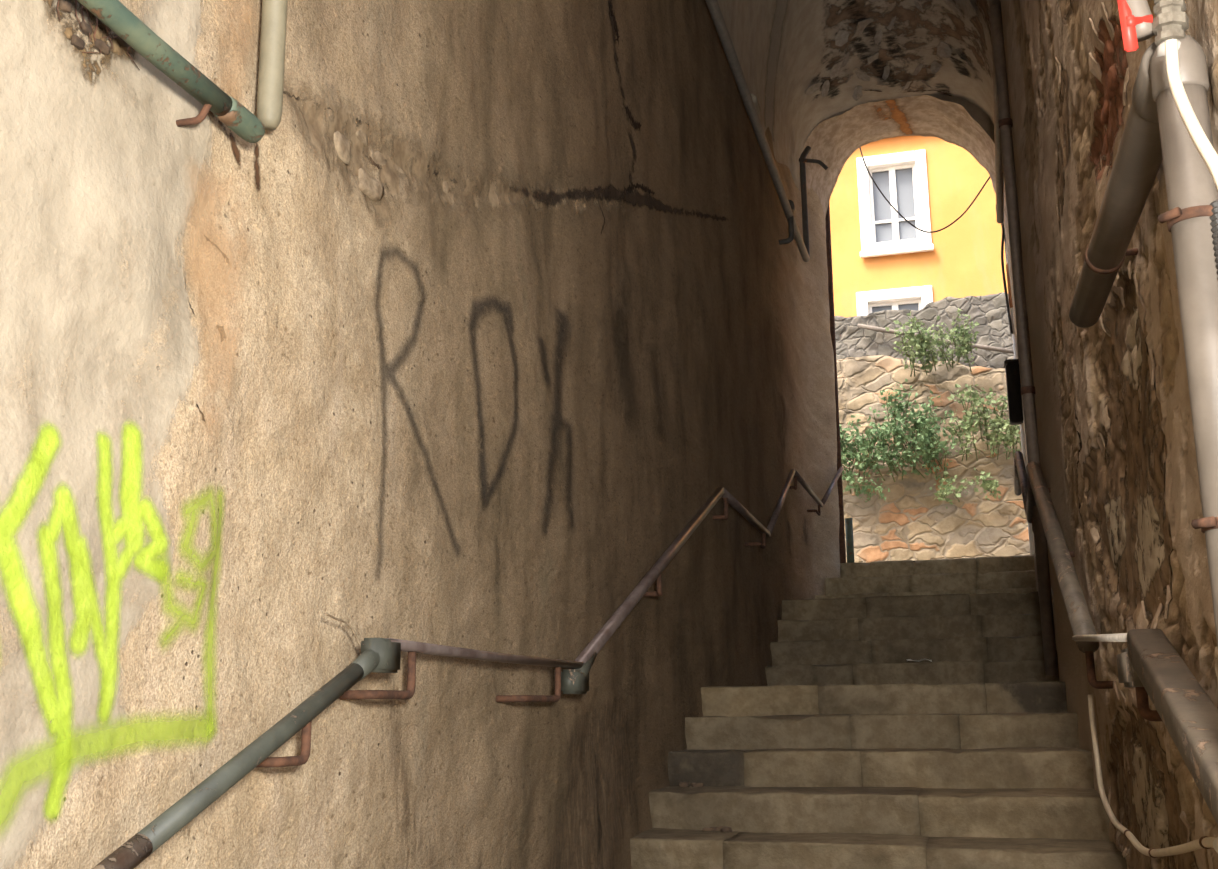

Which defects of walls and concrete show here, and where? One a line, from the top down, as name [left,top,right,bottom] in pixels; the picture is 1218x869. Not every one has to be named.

flaking render [286,87,619,222]
crack [510,0,726,233]
peeling [805,0,992,101]